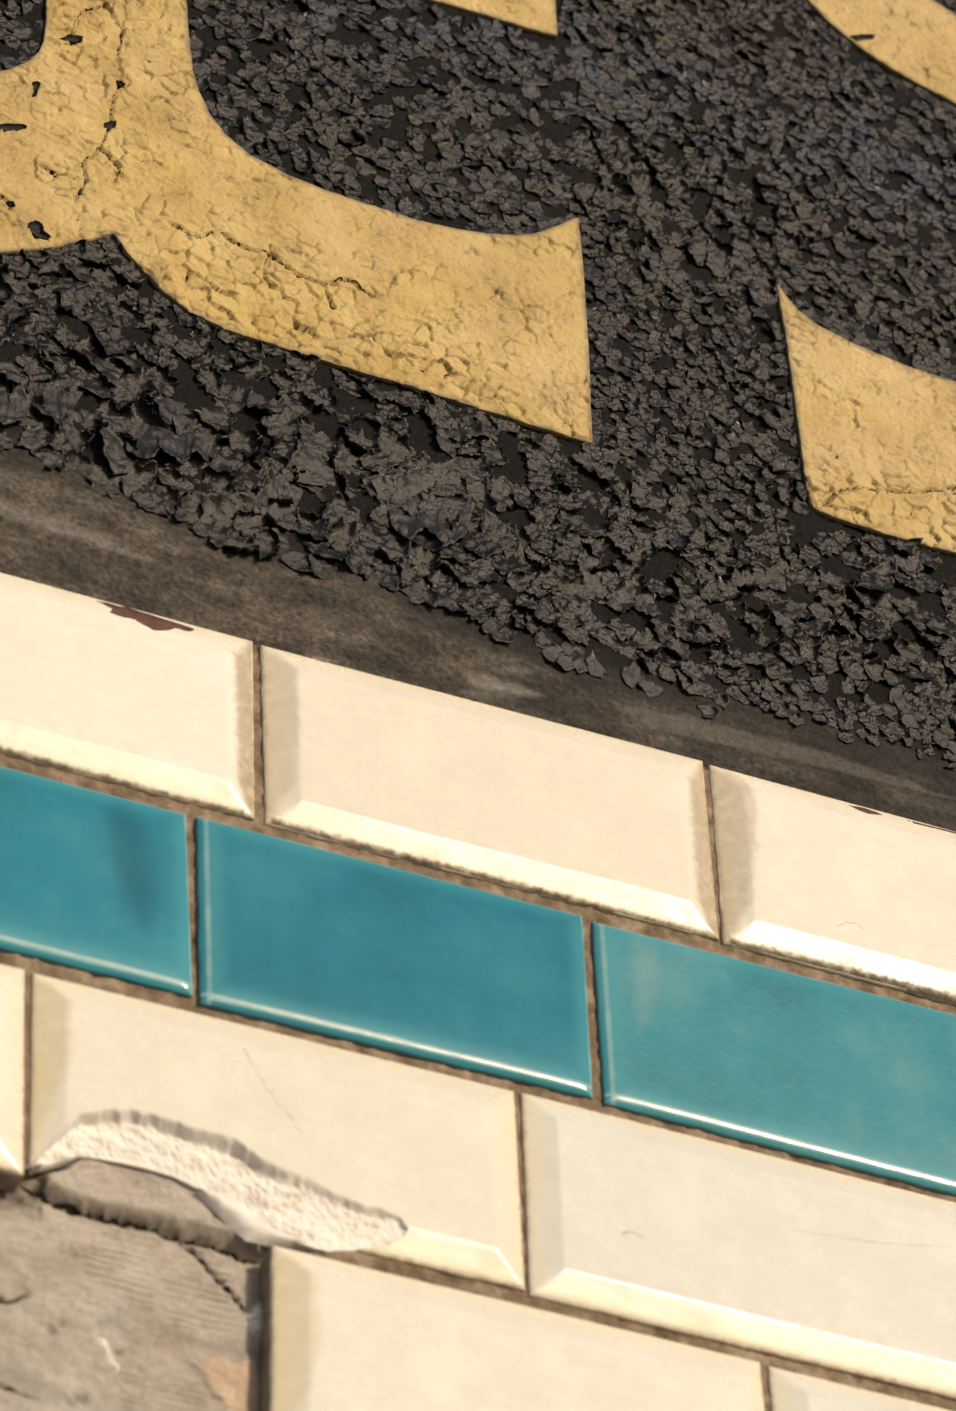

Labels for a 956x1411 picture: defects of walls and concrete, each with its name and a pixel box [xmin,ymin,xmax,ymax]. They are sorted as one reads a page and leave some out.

crack [44,0,123,197]
peeling [0,0,956,774]
crack [19,1185,259,1313]
spalling [27,1108,409,1254]